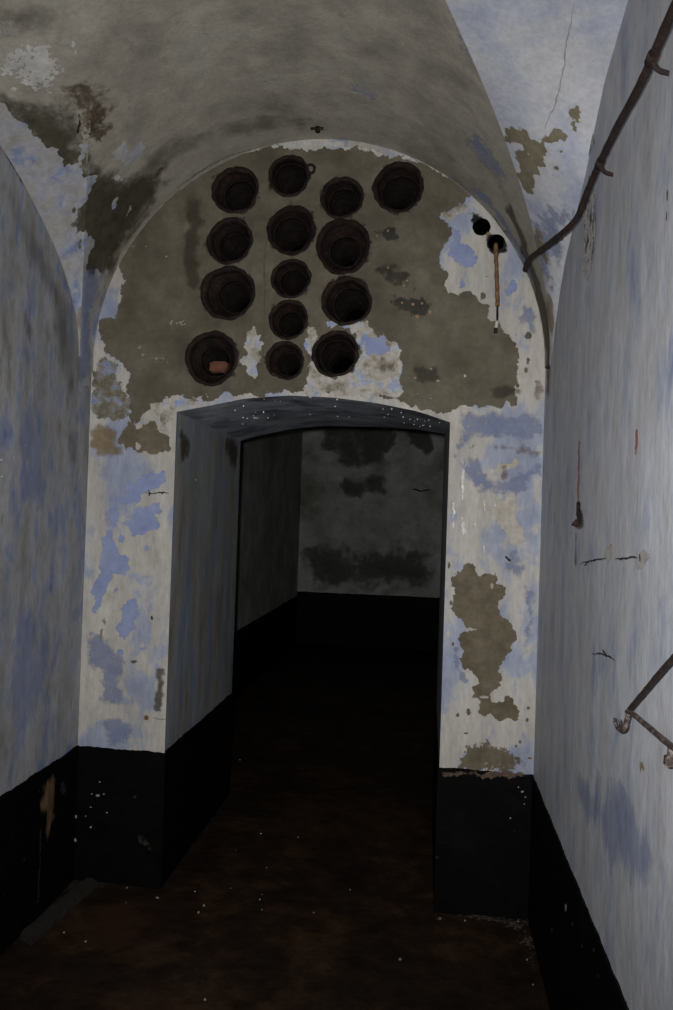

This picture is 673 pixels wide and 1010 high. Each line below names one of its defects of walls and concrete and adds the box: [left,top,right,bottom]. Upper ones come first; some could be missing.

peeling [0,29,77,94]
crack [545,2,575,128]
leakage [1,97,163,276]
peeling [504,105,581,194]
peeling [0,102,568,455]
leakage [321,427,396,466]
leakage [341,477,385,496]
leakage [409,430,434,453]
peeling [90,470,166,614]
leakage [306,548,426,585]
peeling [448,562,530,722]
peeling [442,732,532,805]